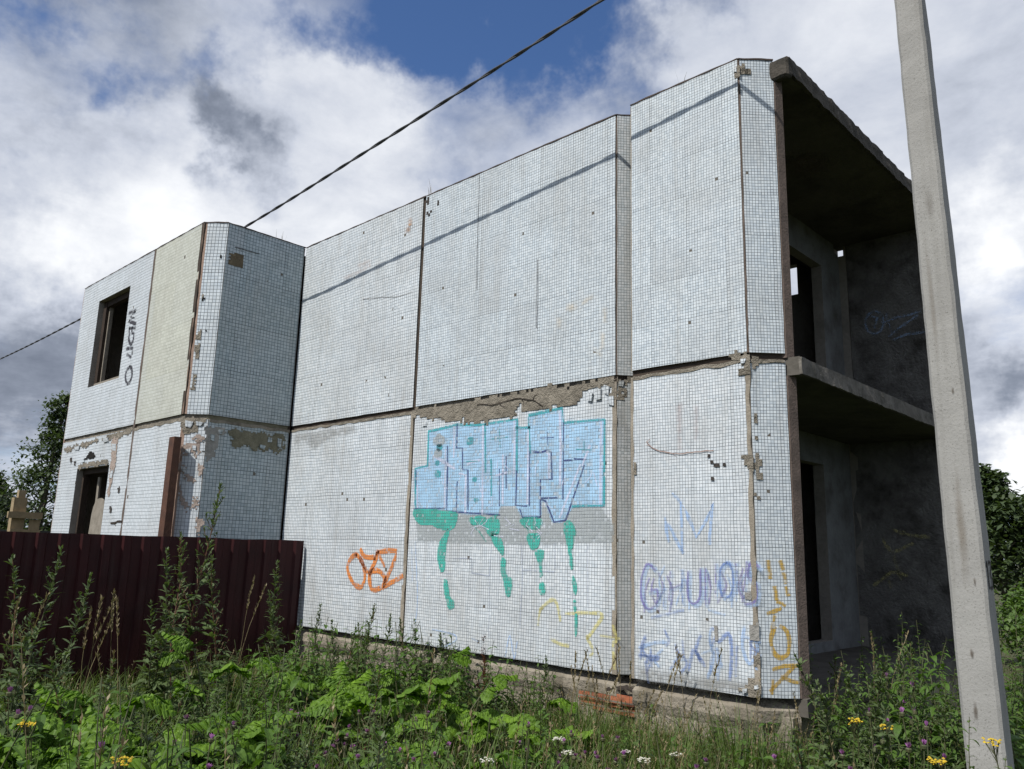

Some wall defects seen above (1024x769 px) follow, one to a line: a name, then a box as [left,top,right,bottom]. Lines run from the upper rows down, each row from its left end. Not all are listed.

spalling [220,253,244,268]
spalling [412,376,632,426]
spalling [64,427,134,513]
peeling [178,416,286,536]